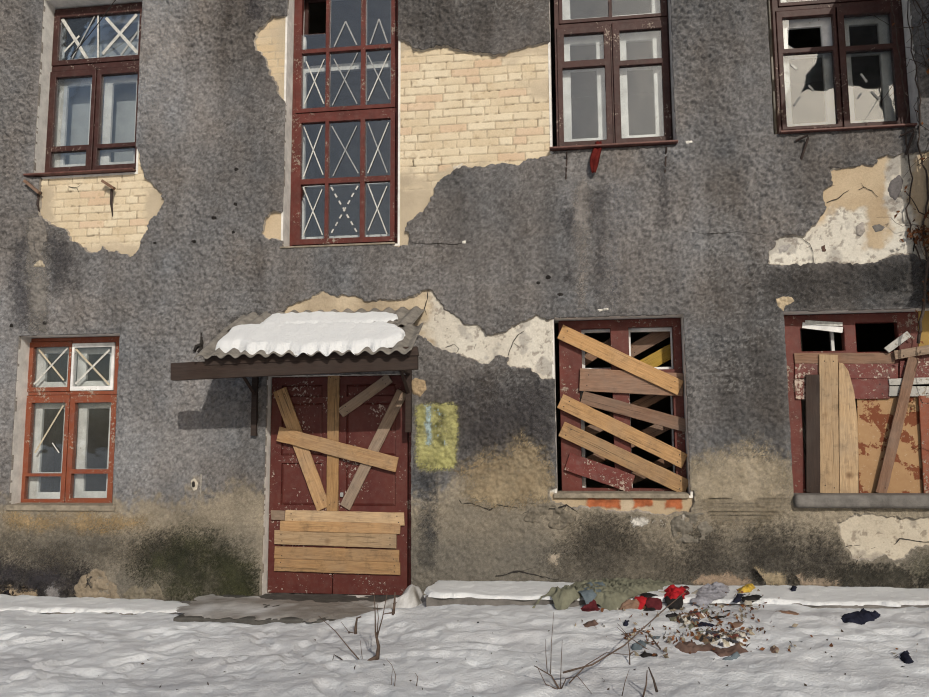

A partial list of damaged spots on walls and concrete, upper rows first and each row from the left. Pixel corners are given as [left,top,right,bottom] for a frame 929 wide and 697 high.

flaking render [254,16,286,100]
flaking render [394,39,551,247]
flaking render [38,153,164,257]
flaking render [262,210,281,241]
flaking render [768,150,929,266]
flaking render [283,289,554,379]
water stain [0,531,143,598]
water stain [549,516,929,589]
flaking render [837,513,929,567]